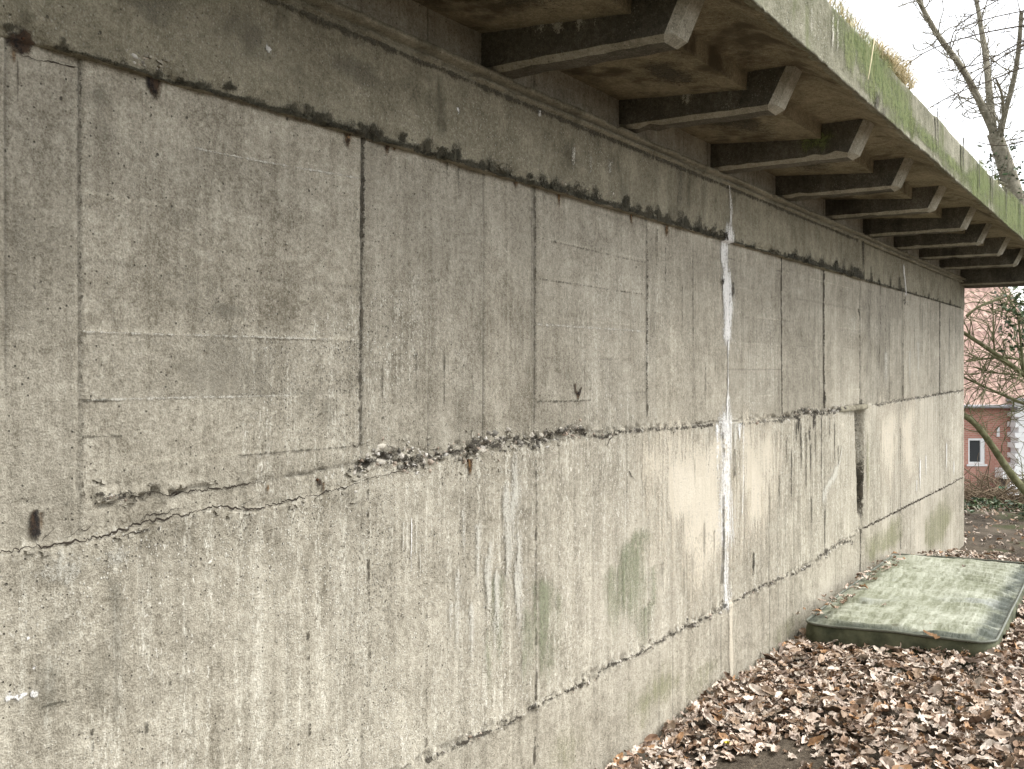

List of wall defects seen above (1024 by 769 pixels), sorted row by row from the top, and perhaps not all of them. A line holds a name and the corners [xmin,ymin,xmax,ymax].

leakage [55,37,961,496]
rust [30,509,43,540]
crack [0,464,426,556]
spalling [346,419,710,503]
crack [863,477,963,528]